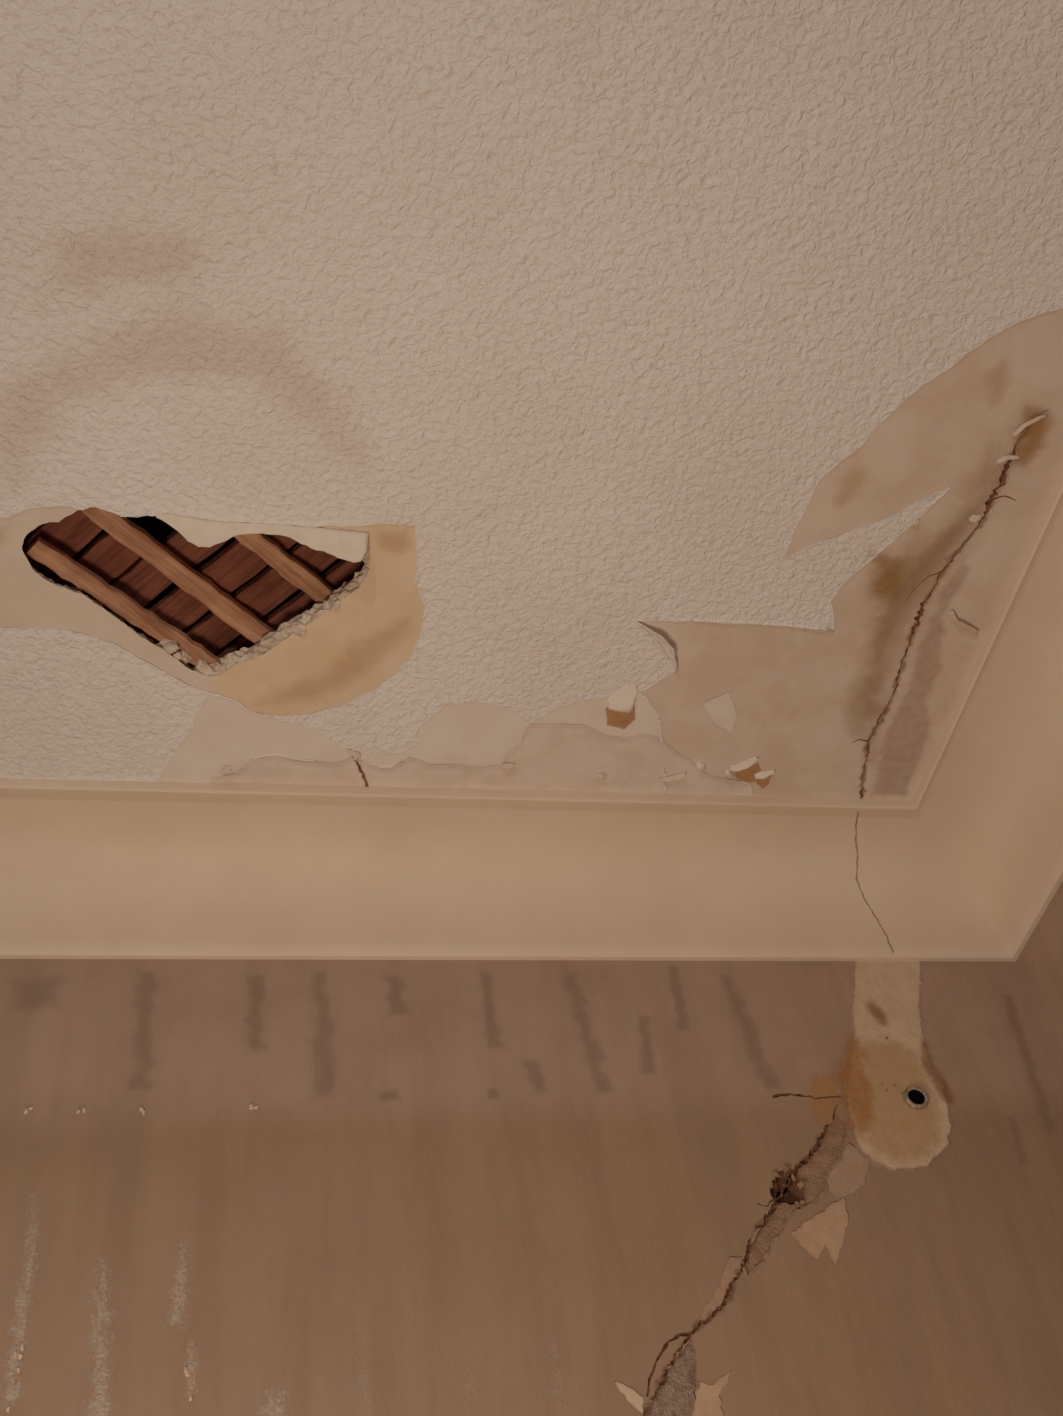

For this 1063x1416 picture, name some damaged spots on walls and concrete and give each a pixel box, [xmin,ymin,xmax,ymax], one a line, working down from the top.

spalling [24,536,370,689]
crack [853,409,1048,953]
crack [351,749,369,787]
crack [644,1093,842,1416]
damp [89,1267,110,1416]
spalling [614,1338,731,1416]